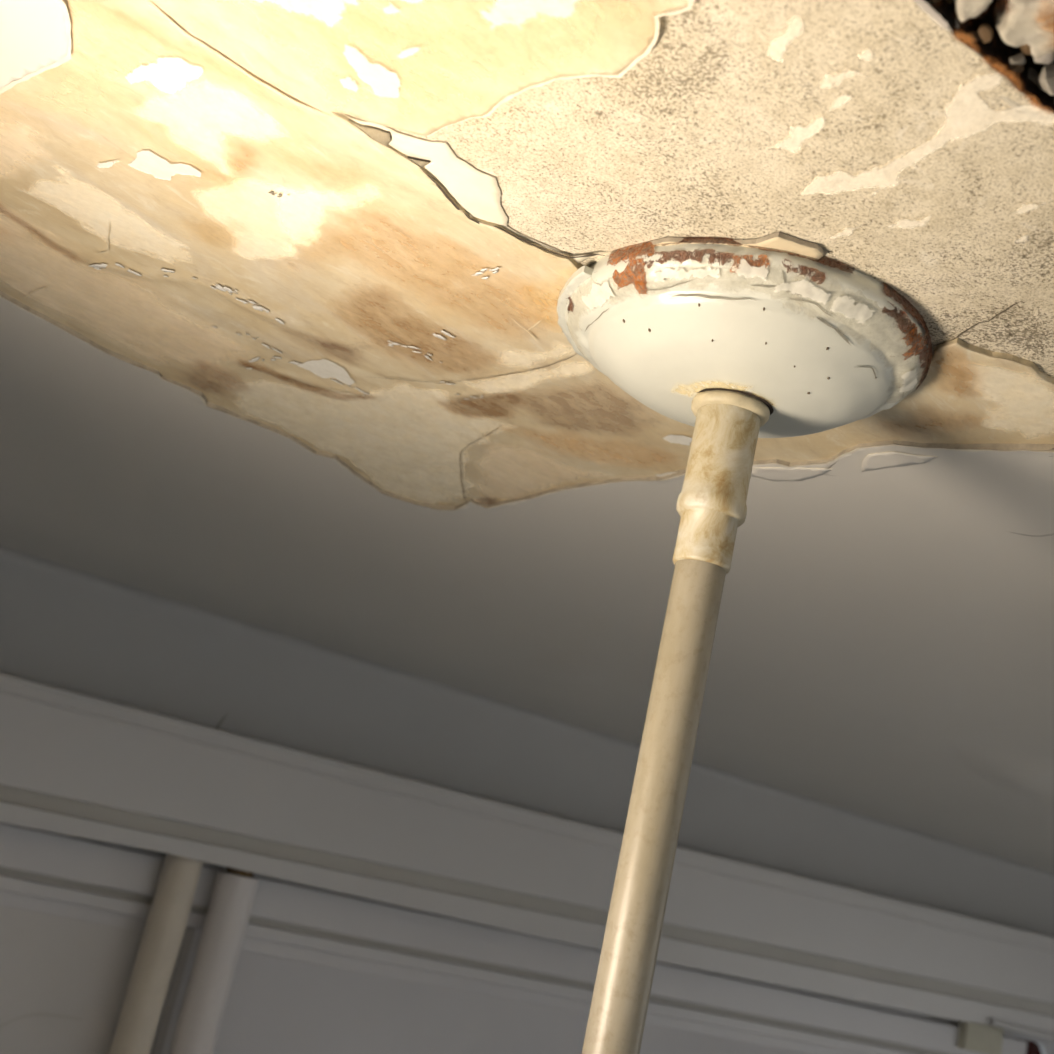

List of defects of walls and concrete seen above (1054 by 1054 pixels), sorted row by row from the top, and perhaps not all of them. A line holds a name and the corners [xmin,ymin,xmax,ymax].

leakage [334,212,561,334]
peeling [0,0,1054,511]
leakage [188,361,371,400]
leakage [302,335,355,363]
leakage [338,289,497,372]
crack [933,300,1024,346]
leakage [442,385,671,466]